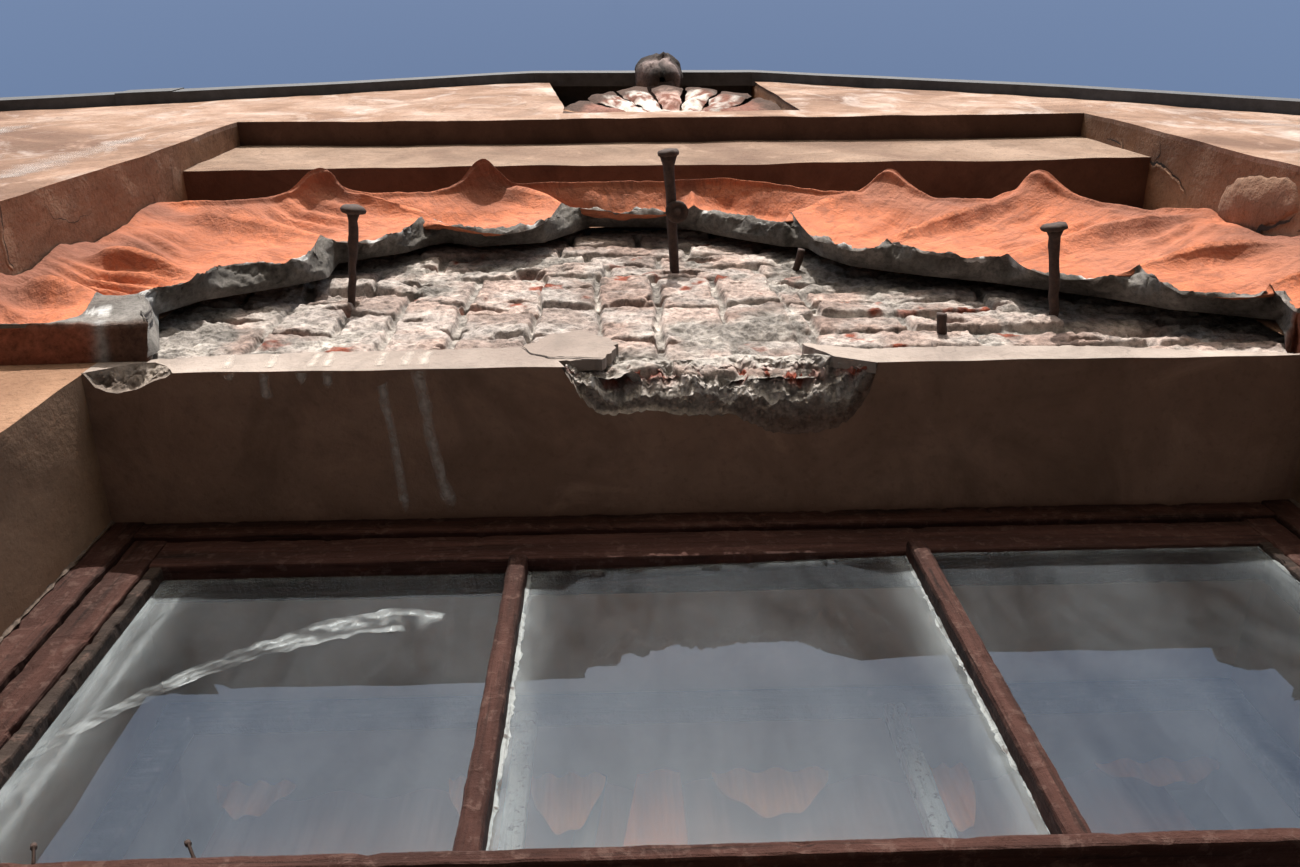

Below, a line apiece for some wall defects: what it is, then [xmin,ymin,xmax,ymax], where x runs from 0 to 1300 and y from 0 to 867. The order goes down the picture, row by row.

spalling [0,203,1300,393]
spalling [520,345,875,434]